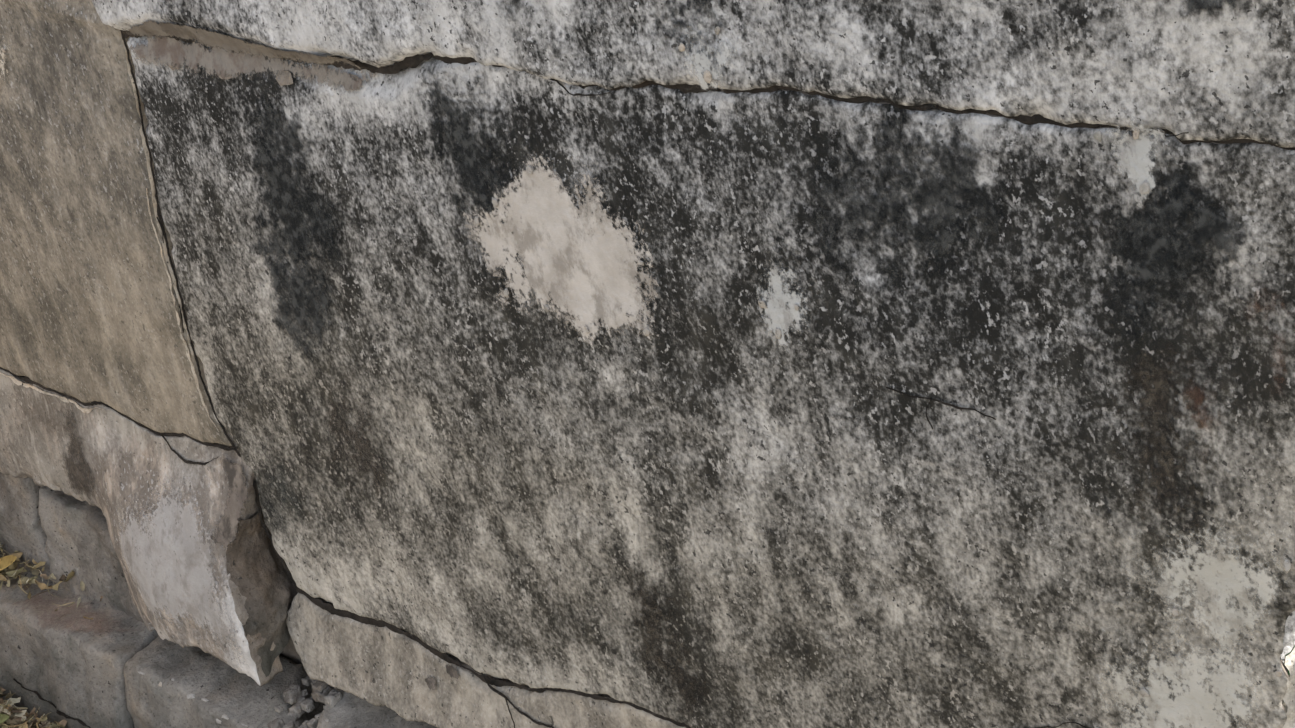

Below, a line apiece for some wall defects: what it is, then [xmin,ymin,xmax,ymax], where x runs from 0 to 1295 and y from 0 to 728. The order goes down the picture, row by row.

damp [250,101,344,363]
damp [426,72,509,223]
damp [804,107,1005,289]
crack [550,79,1295,150]
damp [1105,166,1245,338]
crack [0,30,691,728]
crack [886,387,996,429]
damp [1107,345,1210,521]
damp [627,573,707,710]
crack [1024,720,1091,728]